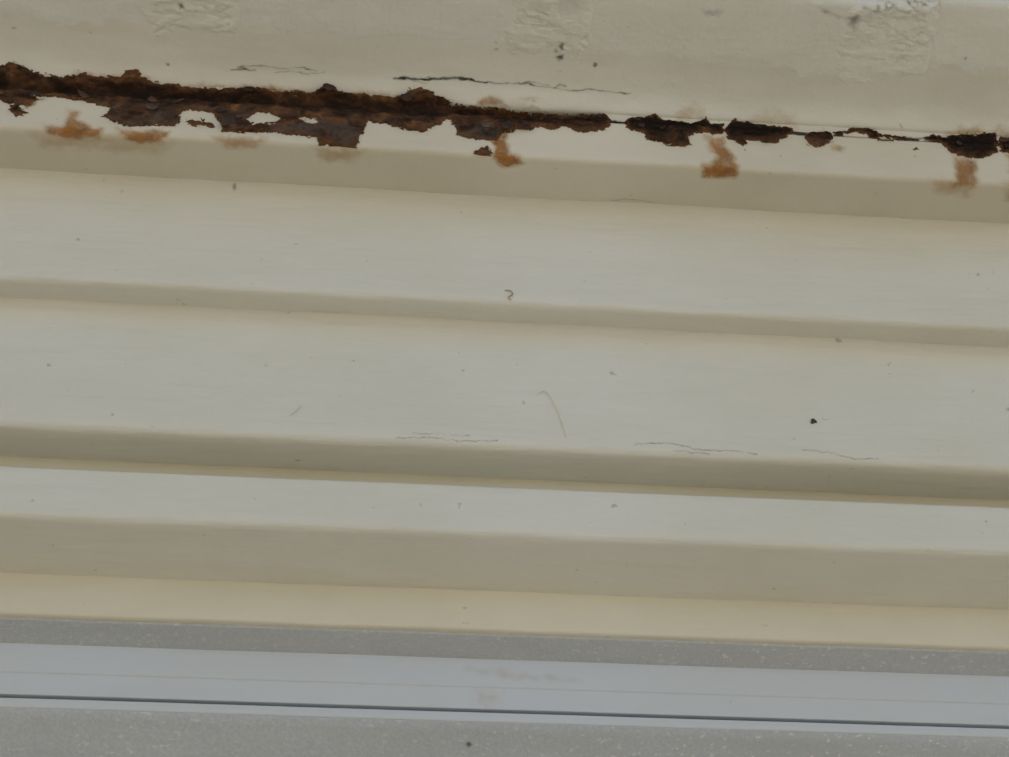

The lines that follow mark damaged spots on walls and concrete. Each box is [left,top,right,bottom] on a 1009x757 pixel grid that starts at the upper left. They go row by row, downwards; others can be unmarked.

rust [48,113,100,139]
rust [125,130,167,143]
rust [491,134,520,167]
rust [703,141,736,178]
rust [957,160,976,185]